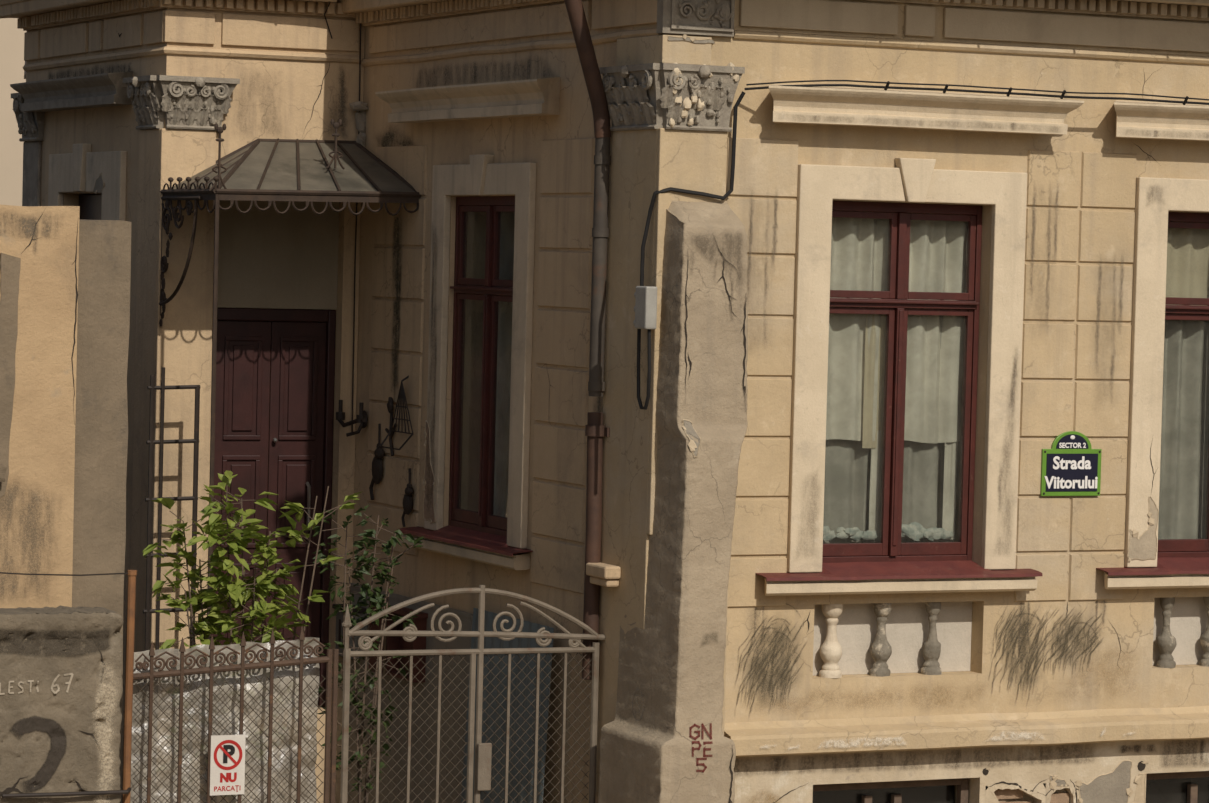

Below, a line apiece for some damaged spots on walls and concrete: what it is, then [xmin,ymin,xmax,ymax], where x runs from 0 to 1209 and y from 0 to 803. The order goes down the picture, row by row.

crack [302,63,330,137]
flaking render [1127,496,1159,562]
leakage [737,609,801,711]
leakage [989,604,1105,690]
flaking render [982,760,1149,803]